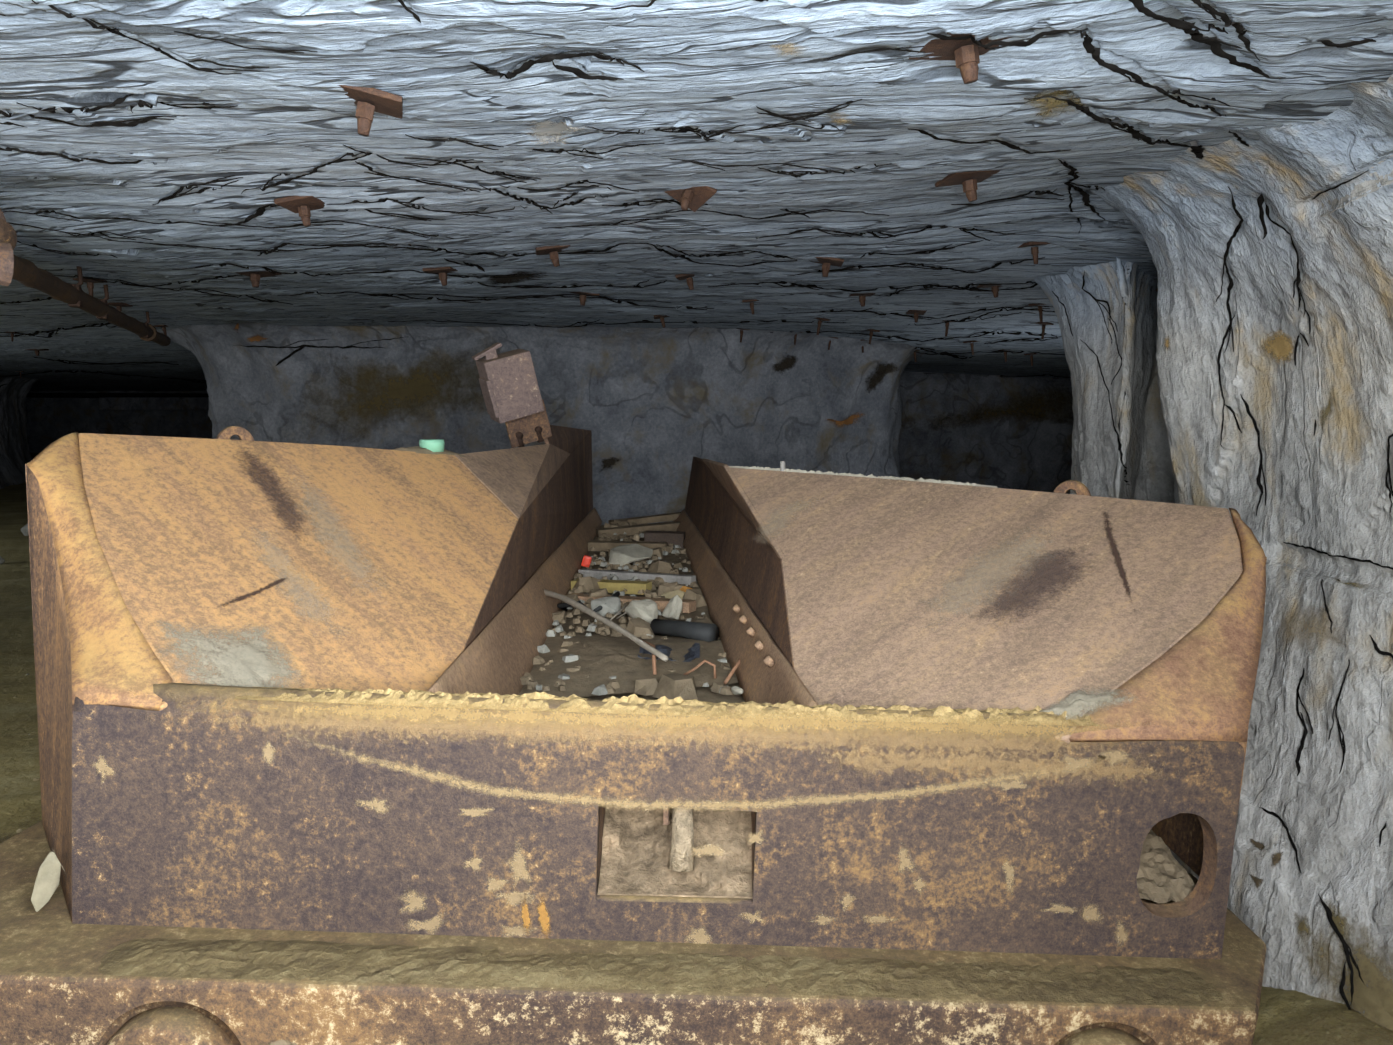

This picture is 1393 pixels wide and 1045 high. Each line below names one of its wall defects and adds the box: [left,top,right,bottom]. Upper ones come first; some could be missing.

crack [0,0,318,165]
crack [398,0,421,23]
crack [470,52,644,81]
crack [611,0,656,10]
crack [823,29,1249,159]
crack [1128,0,1286,79]
crack [1317,39,1376,48]
crack [0,99,1129,485]
crack [1215,186,1311,516]
crack [1385,434,1393,513]
crack [1284,542,1393,776]
crack [1261,807,1365,1010]